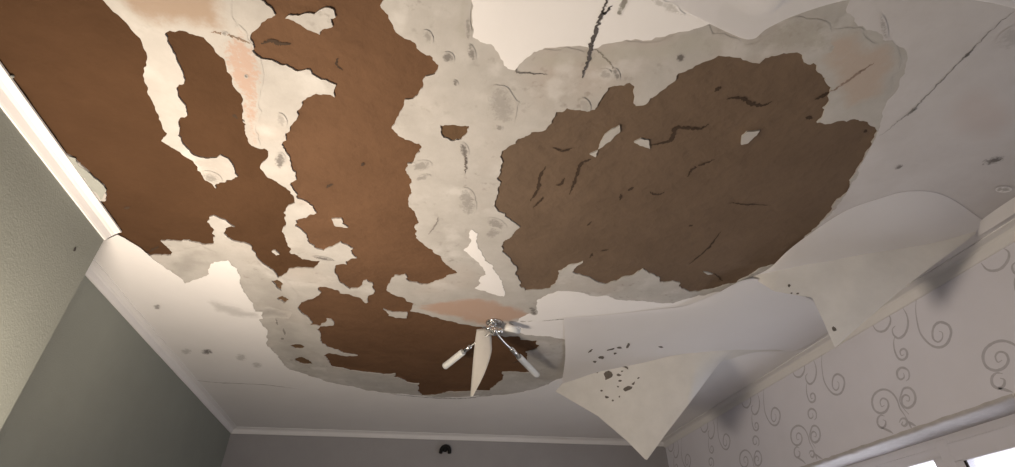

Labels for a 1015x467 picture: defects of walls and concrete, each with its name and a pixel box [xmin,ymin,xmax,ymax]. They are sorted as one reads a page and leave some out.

crack [582,0,614,78]
crack [879,13,1012,136]
flaking render [0,0,483,395]
flaking render [472,0,1015,390]
leakage [412,296,538,327]
peeling [464,230,505,296]